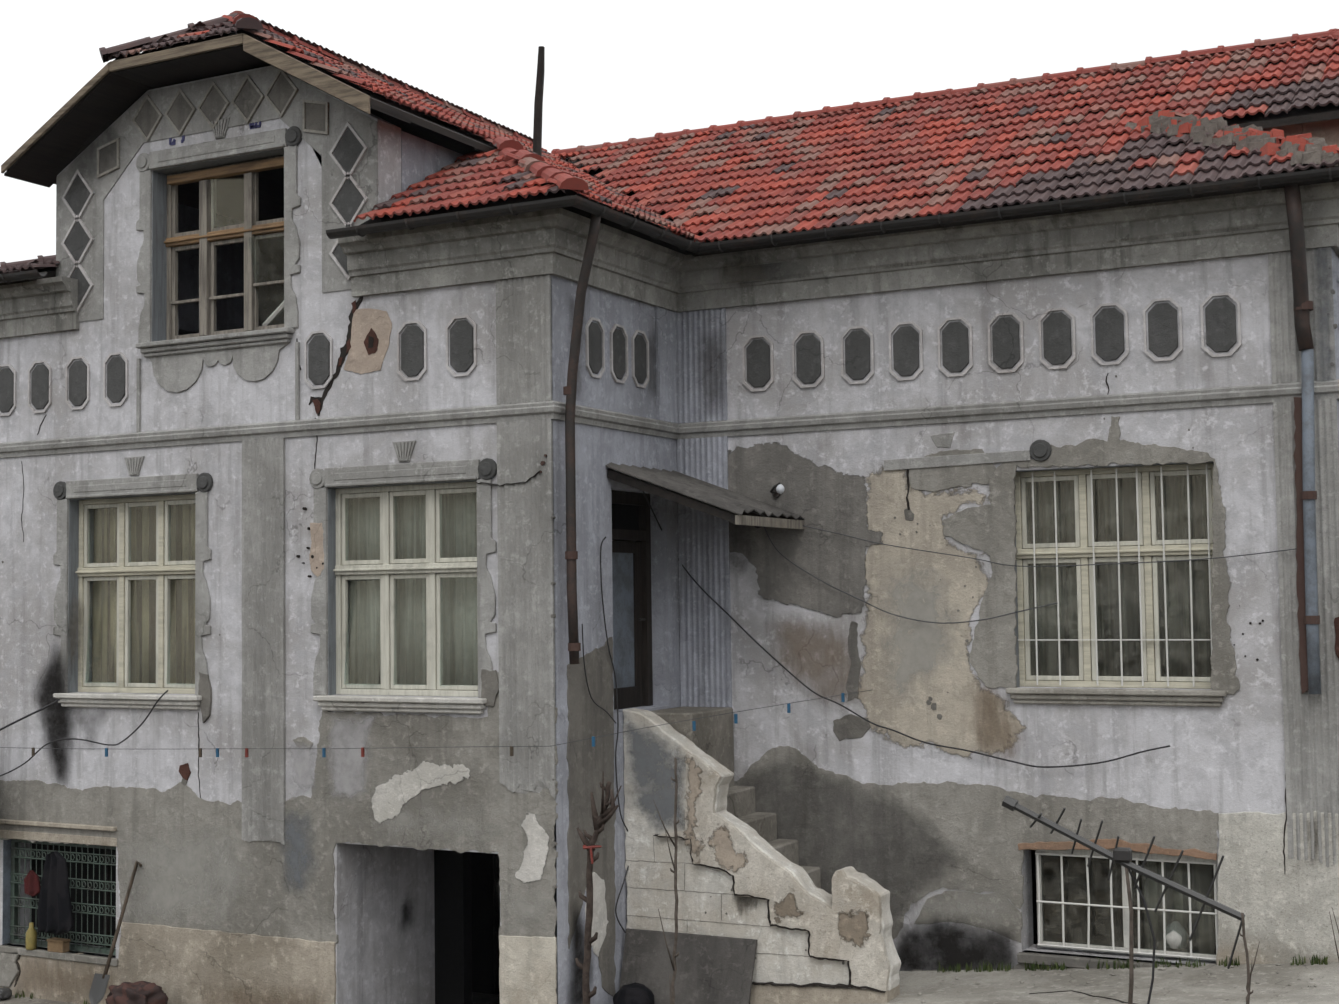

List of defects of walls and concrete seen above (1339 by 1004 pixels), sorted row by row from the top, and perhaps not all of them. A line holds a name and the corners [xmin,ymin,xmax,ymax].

spalling [1124,109,1339,170]
crack [296,296,363,469]
flaking render [858,467,1026,758]
corrosion [1293,397,1309,694]
spalling [371,761,471,824]
spalling [515,812,557,889]
spalling [683,757,748,902]
crack [653,834,886,993]
spalling [774,893,804,923]
spalling [838,909,871,948]